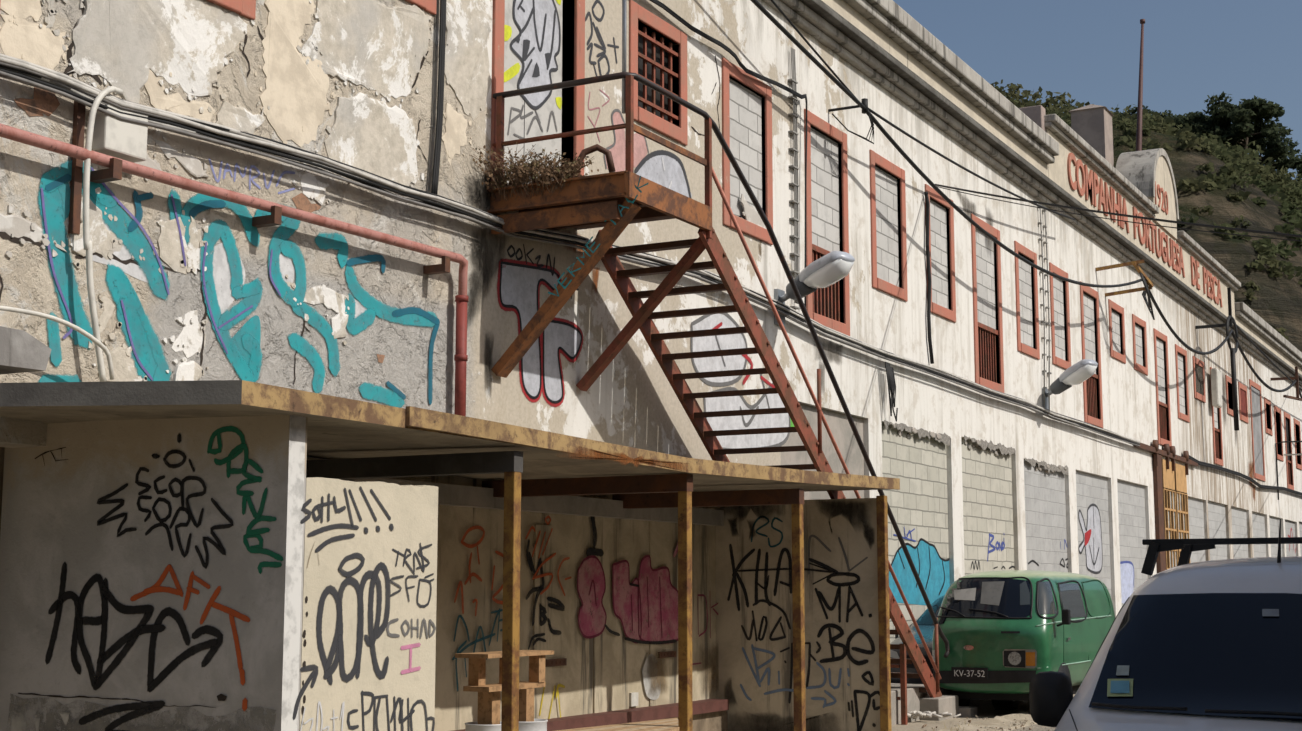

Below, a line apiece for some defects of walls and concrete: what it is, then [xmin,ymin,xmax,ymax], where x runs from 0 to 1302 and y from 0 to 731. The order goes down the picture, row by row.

crack [242,26,264,77]
flaking render [0,0,491,213]
flaking render [0,187,208,276]